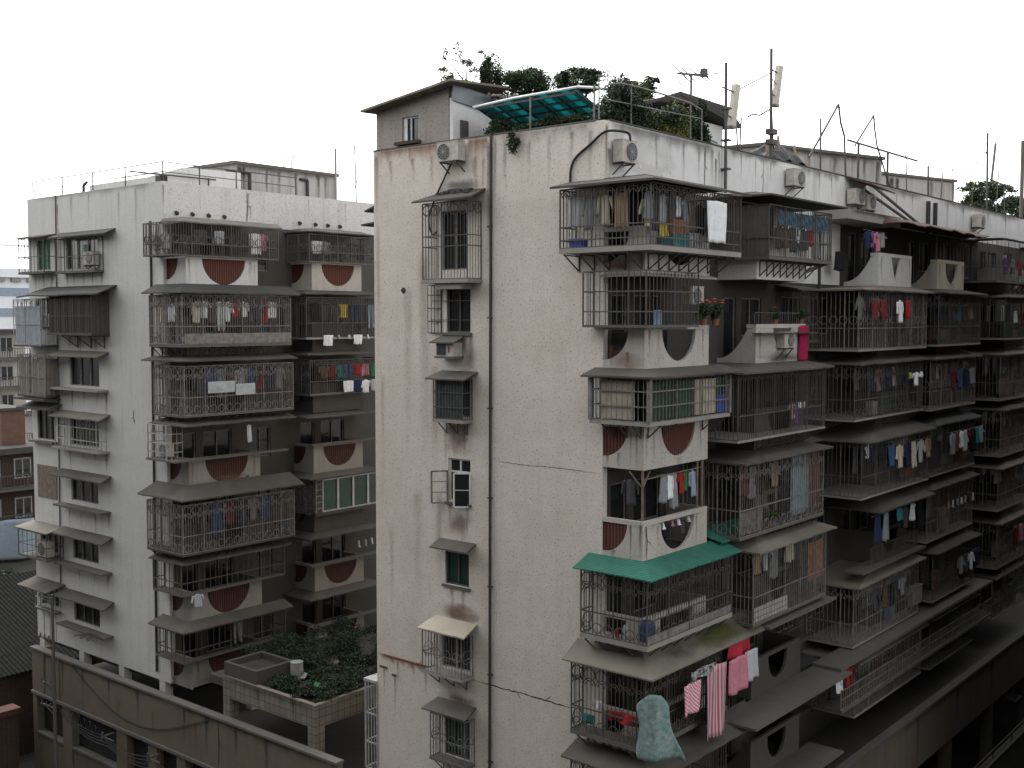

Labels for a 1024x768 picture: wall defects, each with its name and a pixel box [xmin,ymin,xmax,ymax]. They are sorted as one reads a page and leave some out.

corrosion [383,654,428,668]
crack [475,680,574,708]